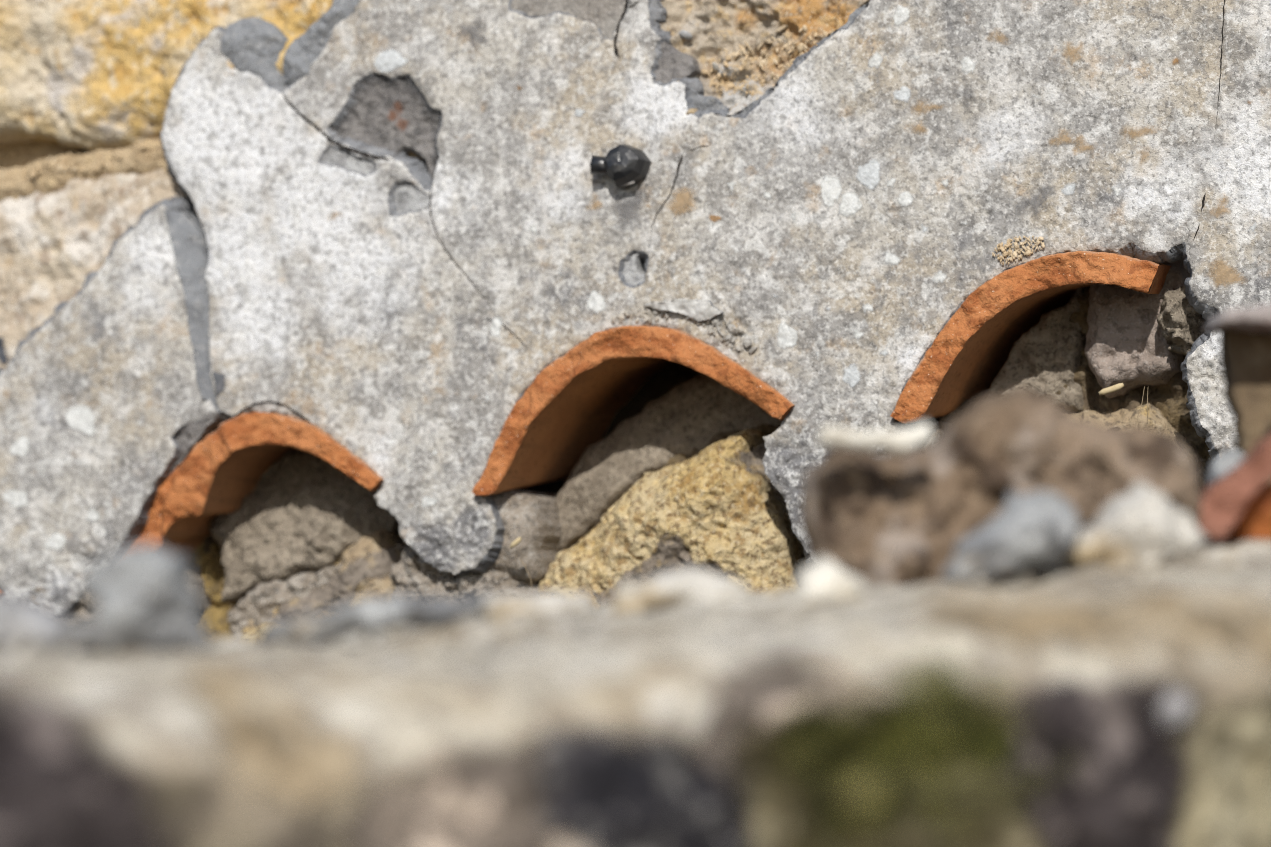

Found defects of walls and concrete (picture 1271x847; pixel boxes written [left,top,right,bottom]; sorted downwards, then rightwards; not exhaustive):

spalling [653,0,870,116]
crack [282,93,390,160]
spalling [322,73,441,180]
crack [649,145,710,246]
crack [429,194,524,345]
spalling [212,371,225,396]
spalling [169,412,223,476]
spalling [816,420,933,454]